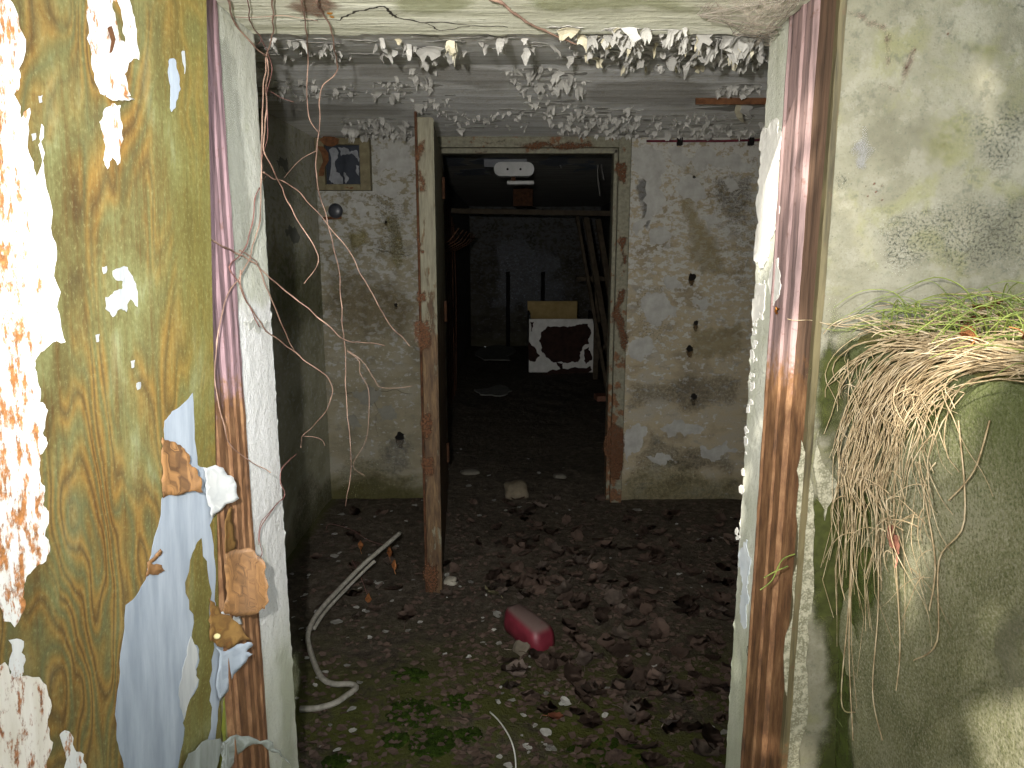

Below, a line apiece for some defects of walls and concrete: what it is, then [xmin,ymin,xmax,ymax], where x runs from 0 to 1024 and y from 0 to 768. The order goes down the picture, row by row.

crack [300,6,508,31]
peeling [86,0,139,169]
corrosion [414,140,425,192]
peeling [255,25,782,413]
leakage [637,180,650,227]
peeling [102,266,138,317]
corrosion [611,288,629,351]
corrosion [603,423,625,480]
peeling [115,393,269,768]